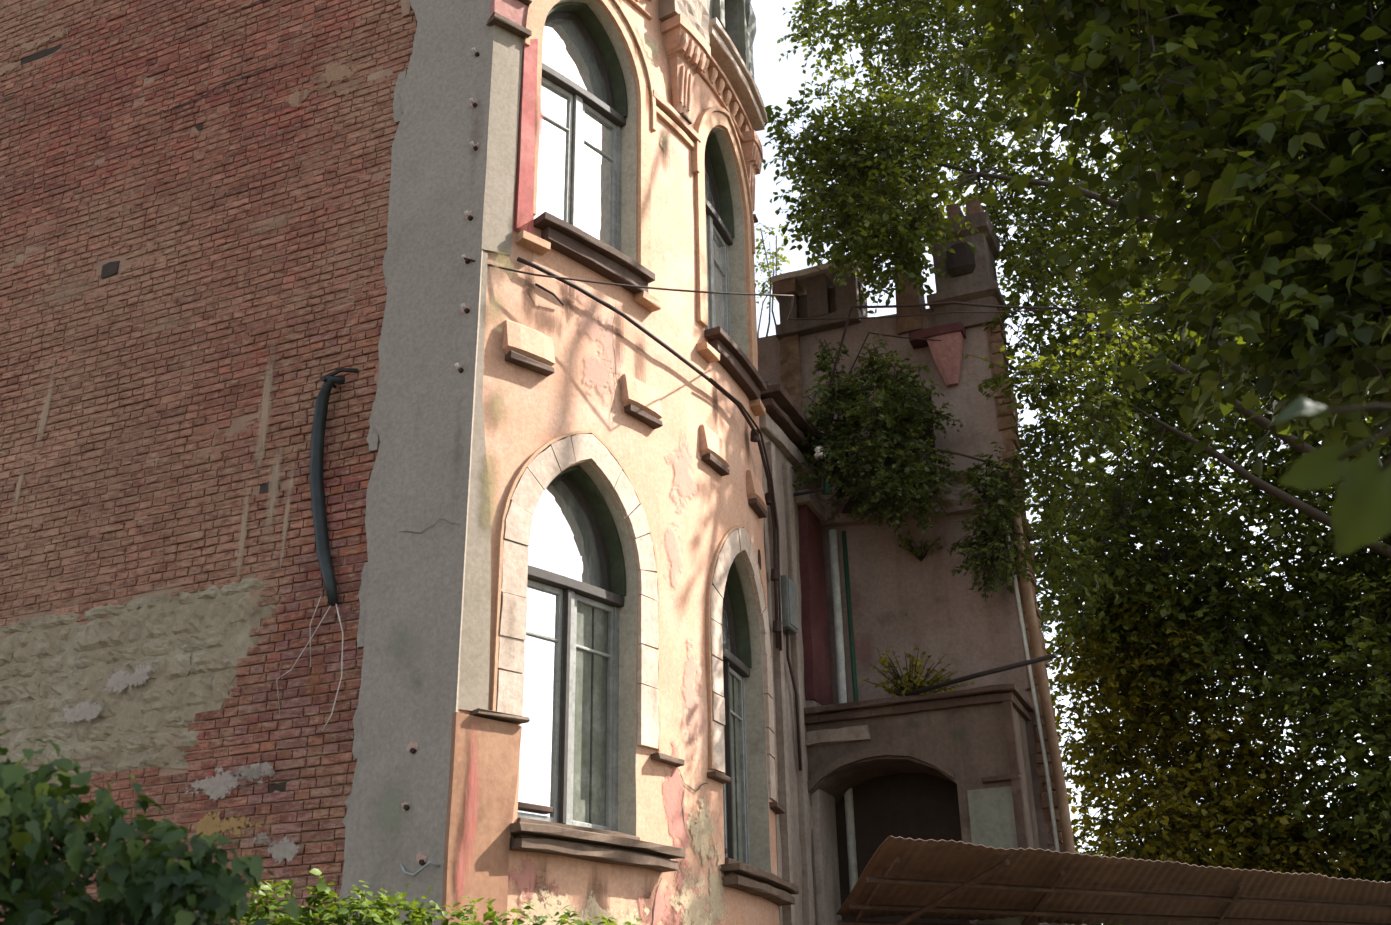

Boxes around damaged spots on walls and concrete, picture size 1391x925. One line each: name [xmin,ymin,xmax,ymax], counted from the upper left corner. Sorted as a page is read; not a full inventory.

leakage [495,254,575,331]
leakage [616,314,645,380]
spalling [268,781,289,793]
spalling [509,637,727,925]
peeling [195,811,263,843]